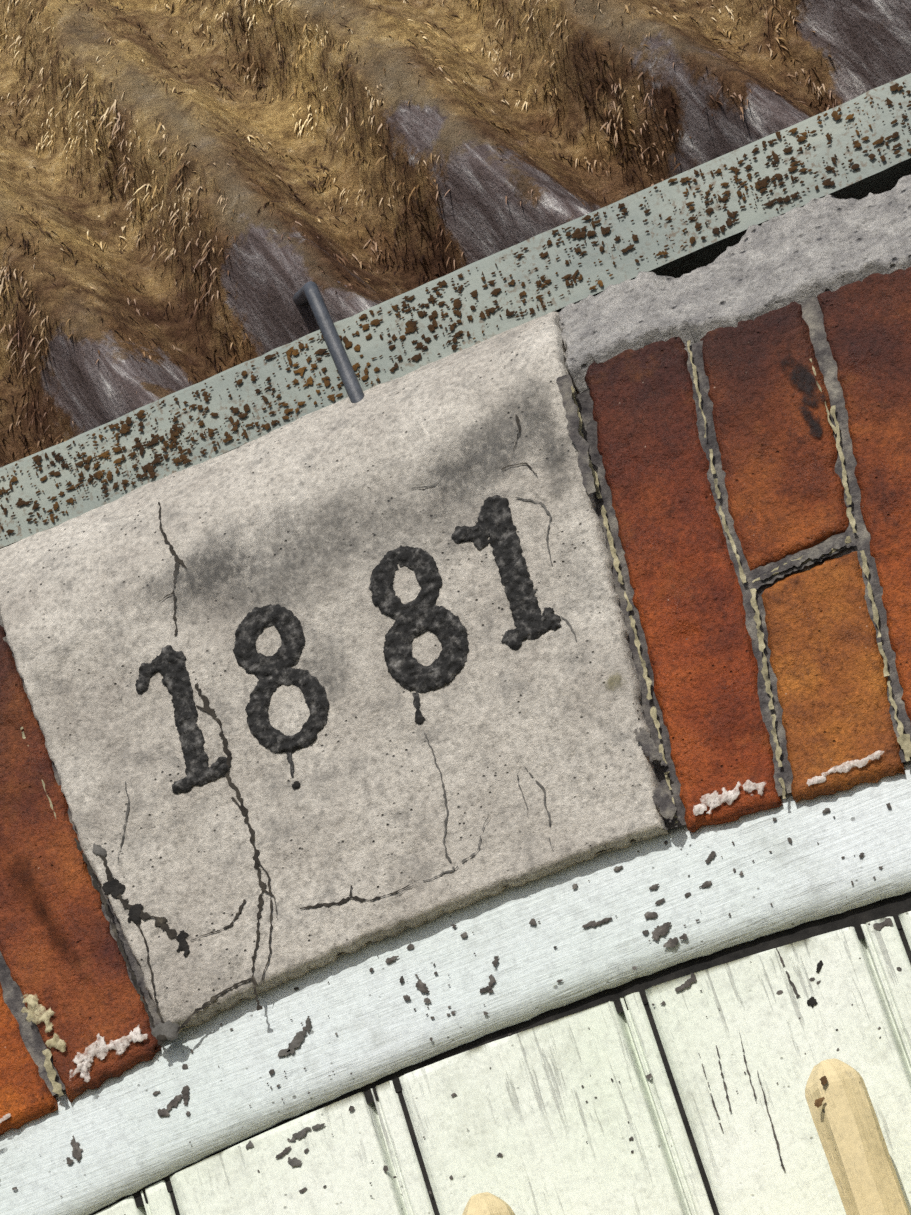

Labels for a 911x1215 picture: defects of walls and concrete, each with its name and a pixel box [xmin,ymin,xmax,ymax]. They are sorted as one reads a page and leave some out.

corrosion [339,82,911,384]
corrosion [0,332,343,537]
water stain [546,374,596,494]
crack [158,502,187,636]
crack [517,764,553,850]
water stain [652,780,765,827]
efflorescence [807,750,884,786]
crack [74,683,489,1045]
peeling [642,884,688,948]
peeling [399,976,431,1004]
peeling [480,958,498,993]
water stain [70,1027,147,1082]